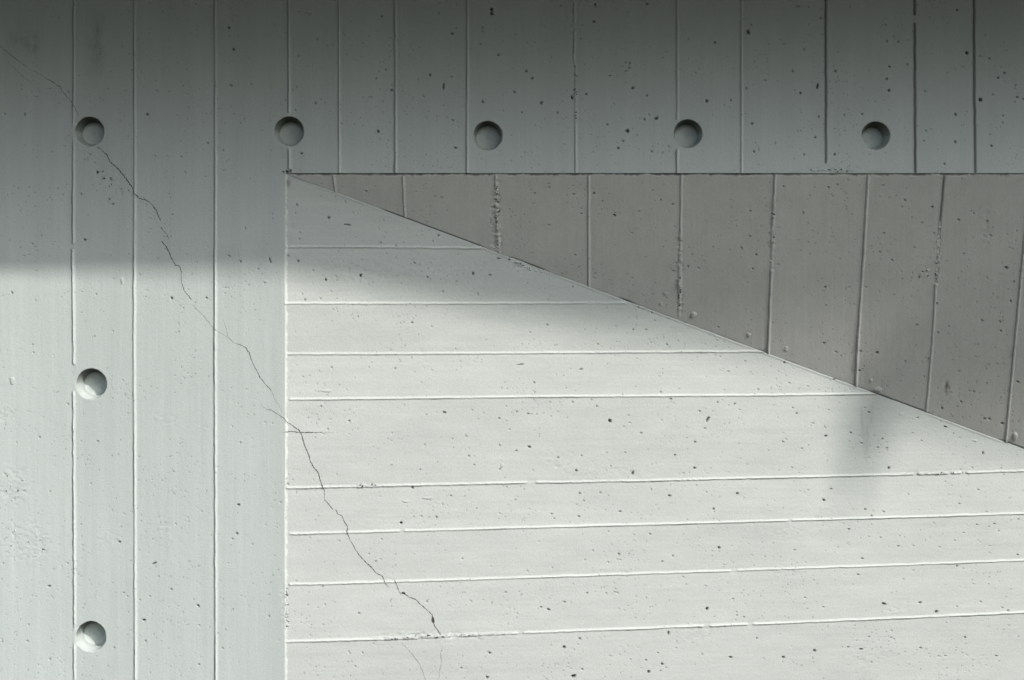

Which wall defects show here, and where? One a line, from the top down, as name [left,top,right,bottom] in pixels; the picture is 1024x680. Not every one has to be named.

crack [97,147,441,680]